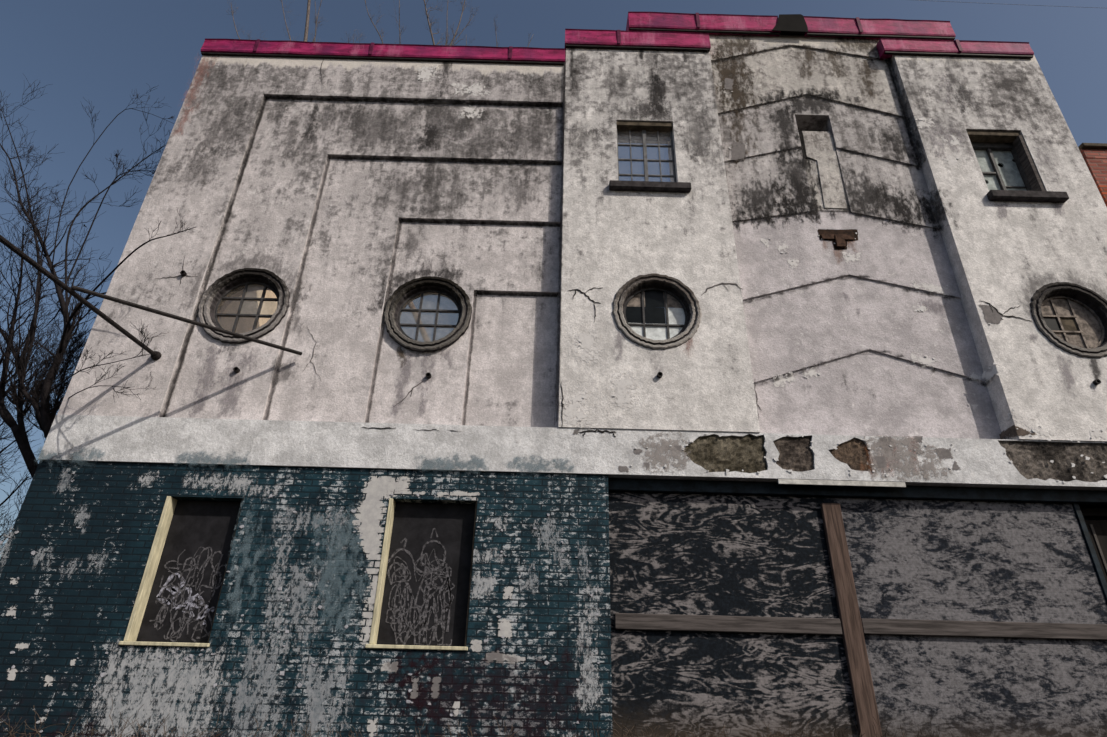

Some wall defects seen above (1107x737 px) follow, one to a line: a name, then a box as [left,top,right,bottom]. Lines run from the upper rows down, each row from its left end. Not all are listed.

leakage [711,35,944,231]
leakage [162,48,576,425]
crack [568,287,601,322]
crack [704,283,742,293]
crack [979,300,1030,321]
spalling [619,433,816,475]
spalling [829,434,960,480]
spalling [998,408,1107,483]
peeling [73,473,480,737]